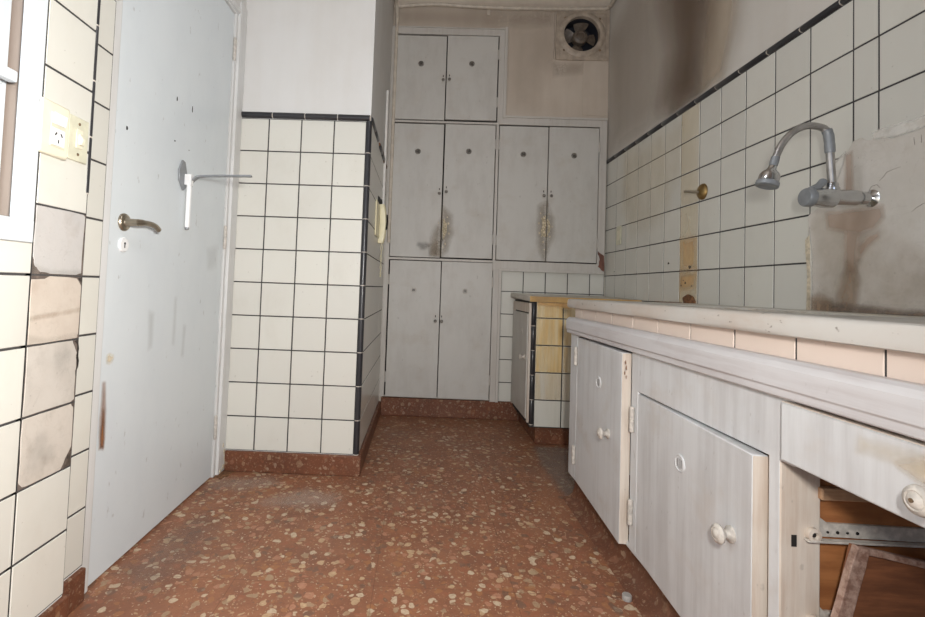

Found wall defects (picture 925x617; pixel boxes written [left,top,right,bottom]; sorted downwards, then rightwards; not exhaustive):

peeling [805,116,925,313]
crack [73,340,81,376]